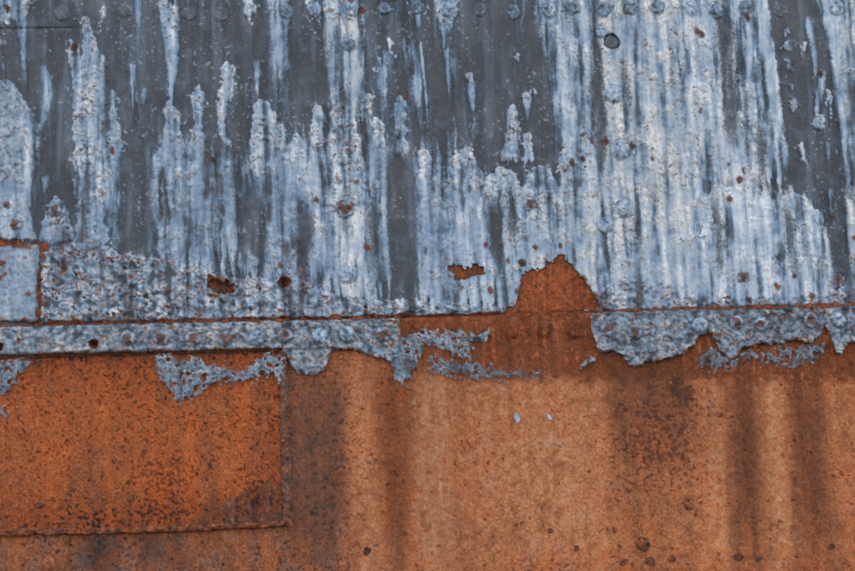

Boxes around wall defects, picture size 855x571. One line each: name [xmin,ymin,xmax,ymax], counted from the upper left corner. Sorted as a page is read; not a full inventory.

peeling [0,0,855,418]
corrosion [0,239,855,554]
corrosion [635,536,655,566]